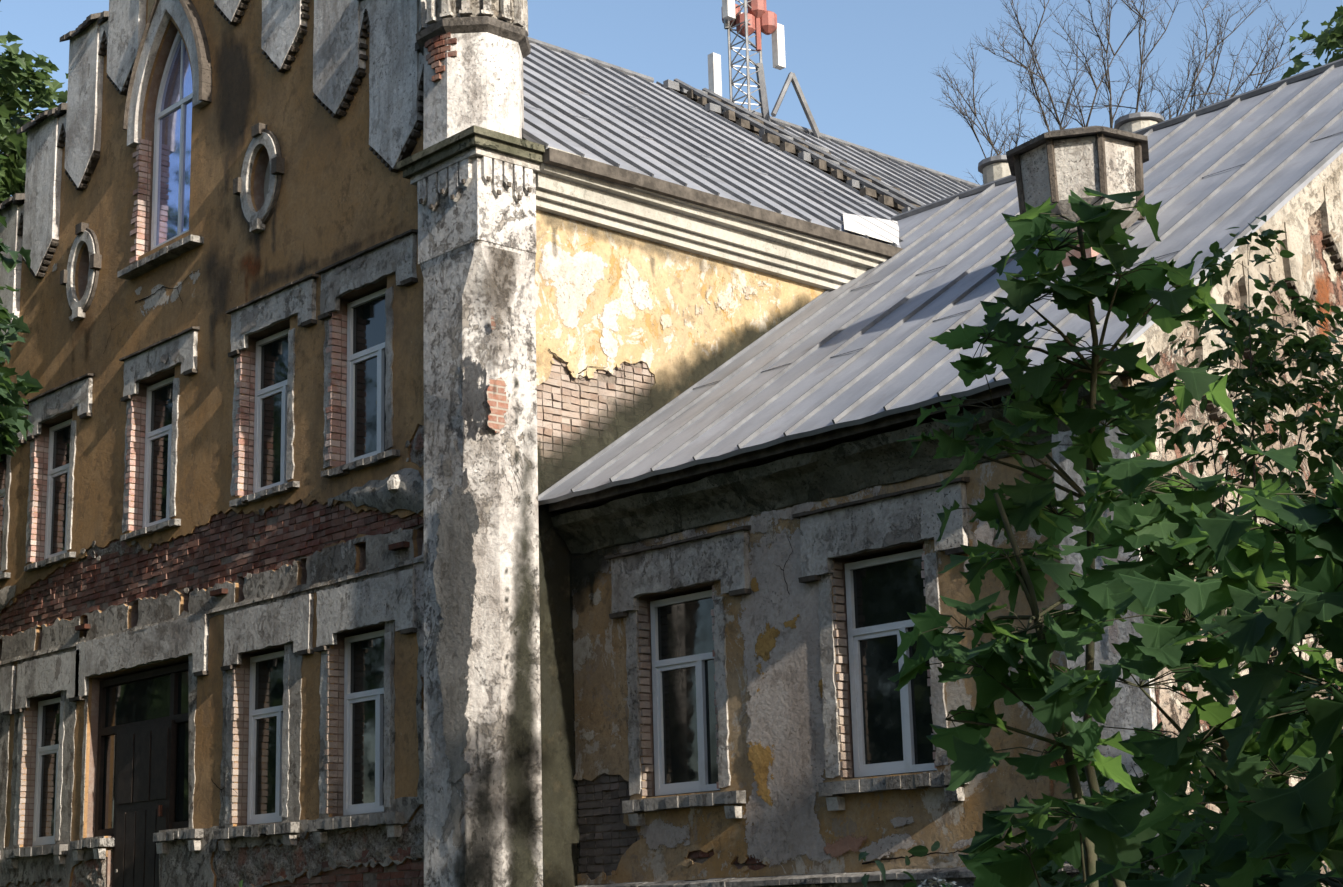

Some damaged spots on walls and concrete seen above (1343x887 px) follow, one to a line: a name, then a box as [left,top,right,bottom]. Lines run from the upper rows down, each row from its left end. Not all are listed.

flaking render [535,232,767,458]